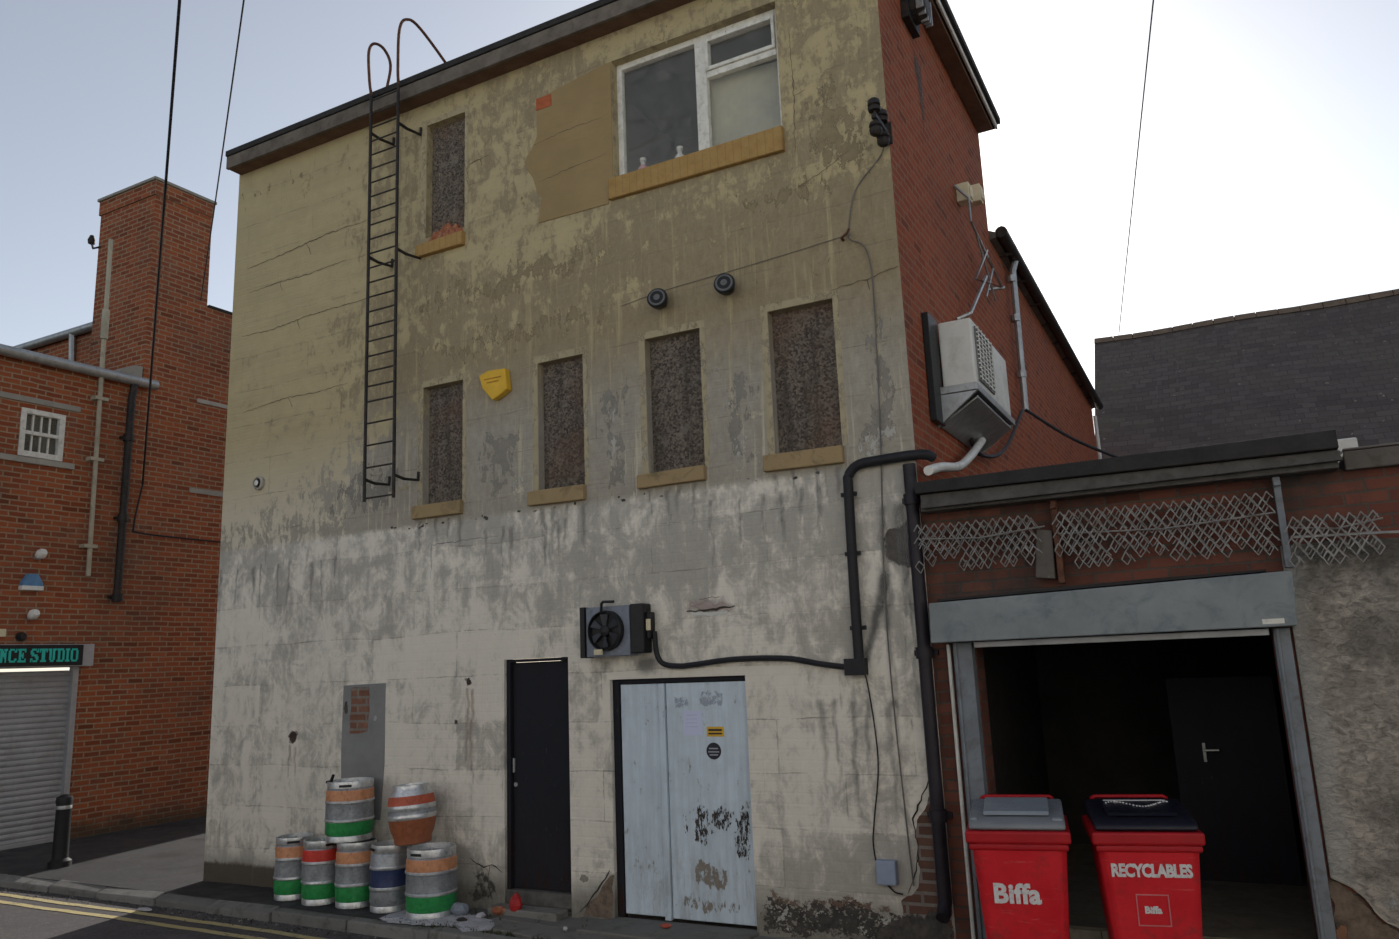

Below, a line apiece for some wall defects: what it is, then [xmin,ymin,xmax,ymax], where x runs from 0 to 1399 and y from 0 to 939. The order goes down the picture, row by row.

flaking render [536,94,551,111]
peeling [736,74,870,213]
peeling [419,246,619,367]
peeling [330,463,408,517]
peeling [478,429,523,498]
peeling [600,384,628,502]
peeling [712,369,759,481]
peeling [858,317,897,457]
water stain [865,573,888,658]
water stain [473,869,495,900]
flaking render [1329,877,1399,939]